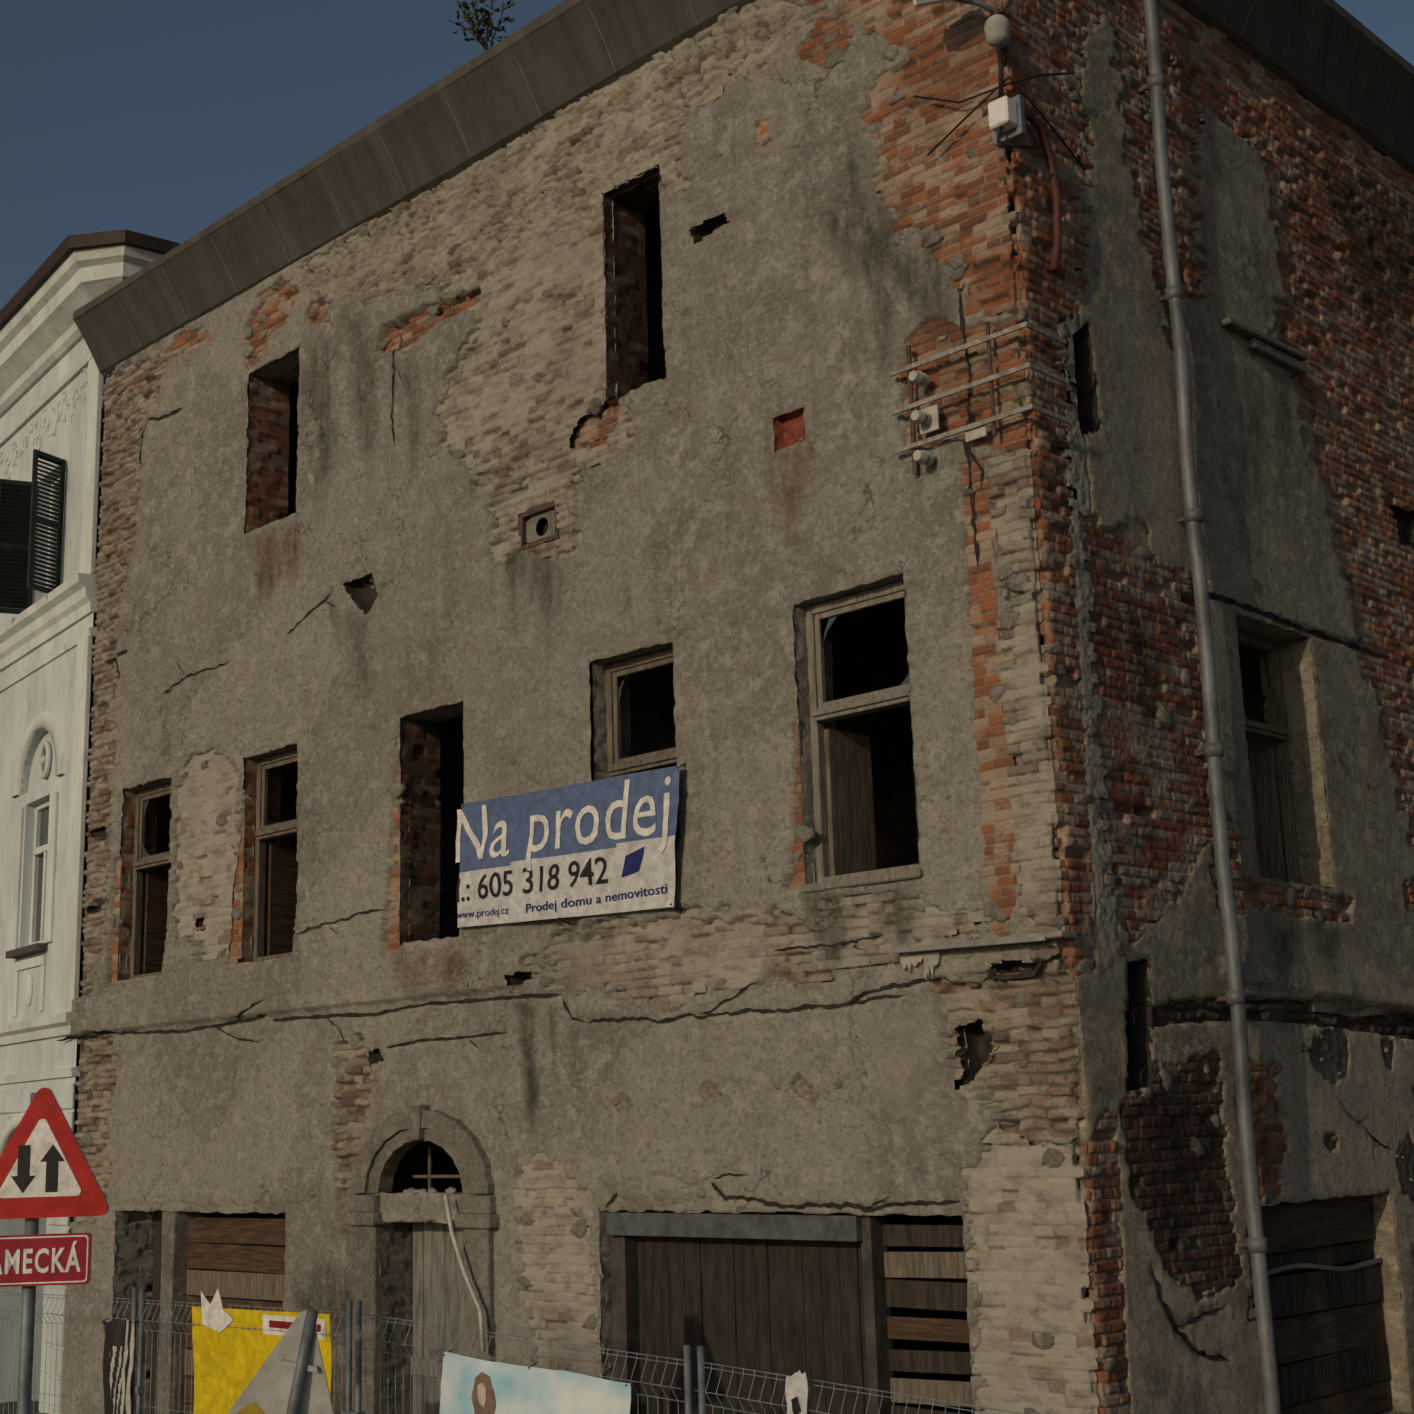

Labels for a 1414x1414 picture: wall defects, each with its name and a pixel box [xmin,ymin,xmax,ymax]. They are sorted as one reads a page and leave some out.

flaking render [243,0,854,562]
spalling [80,326,211,996]
crack [288,590,338,633]
spalling [509,308,1100,1014]
spalling [74,1033,119,1200]
spalling [331,1033,384,1232]
crack [56,977,942,1049]
spalling [513,1153,605,1378]
crack [774,935,881,951]
crack [711,1173,960,1212]
flaking render [956,1019,999,1085]
crack [1152,1271,1228,1361]